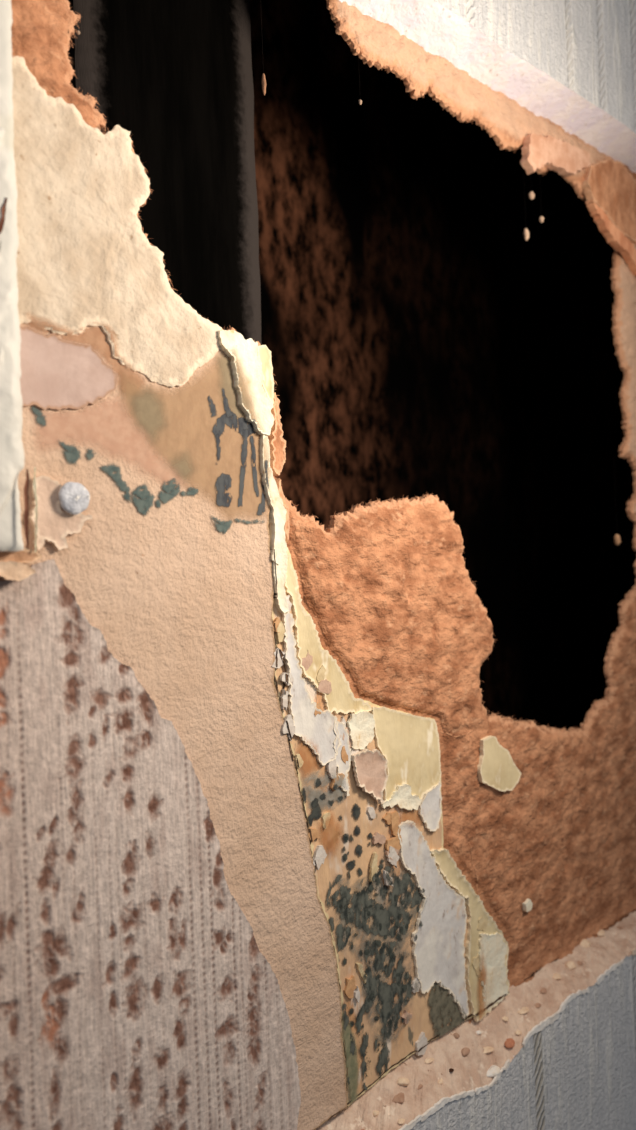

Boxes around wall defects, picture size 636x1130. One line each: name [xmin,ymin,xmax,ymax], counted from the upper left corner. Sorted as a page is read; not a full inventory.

peeling [20,326,118,411]
damp [29,317,269,534]
peeling [218,330,636,1130]
mould [302,774,425,1103]
mould [428,983,467,1036]